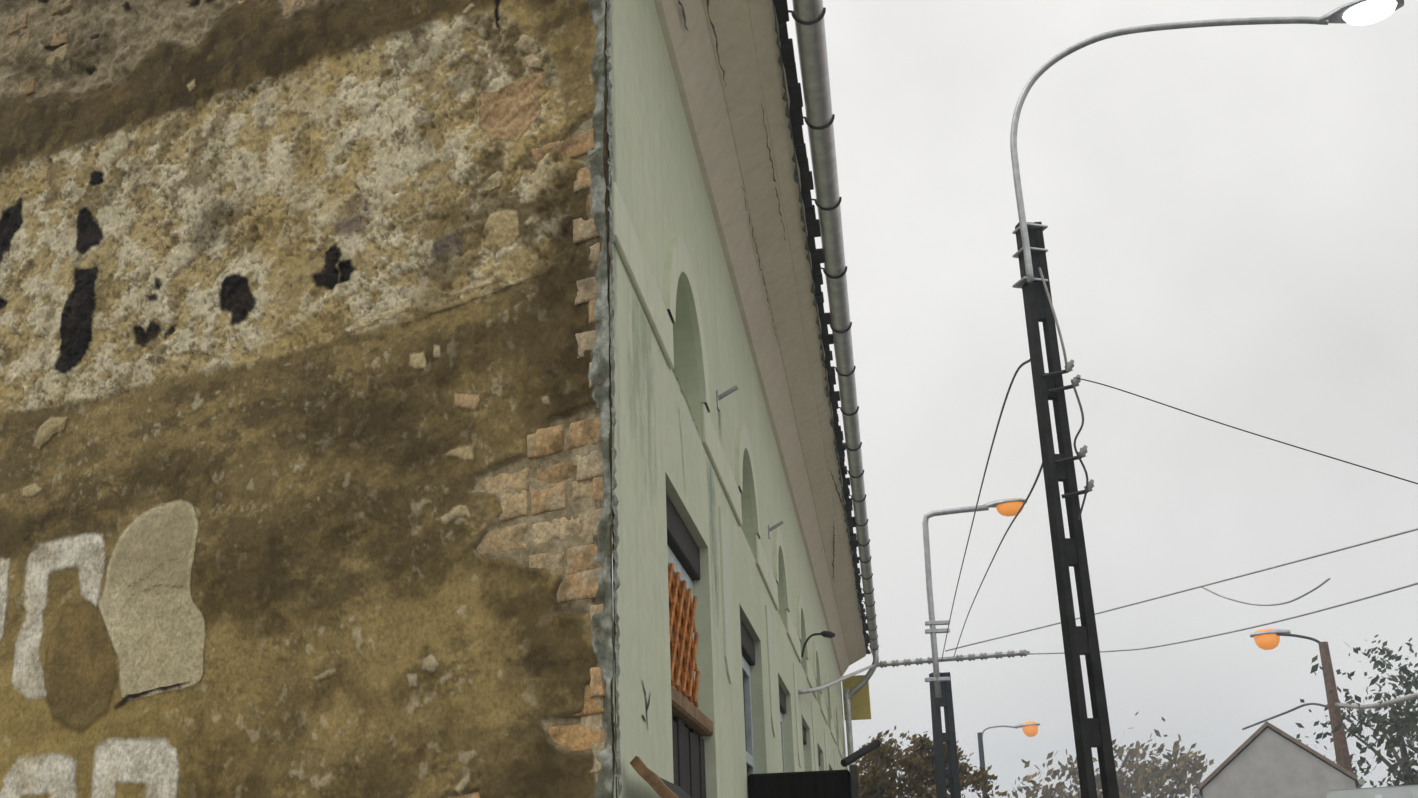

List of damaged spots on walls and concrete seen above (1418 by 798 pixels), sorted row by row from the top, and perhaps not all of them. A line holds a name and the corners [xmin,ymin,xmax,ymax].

flaking render [409,345,440,369]
flaking render [440,0,622,798]
flaking render [407,654,439,687]